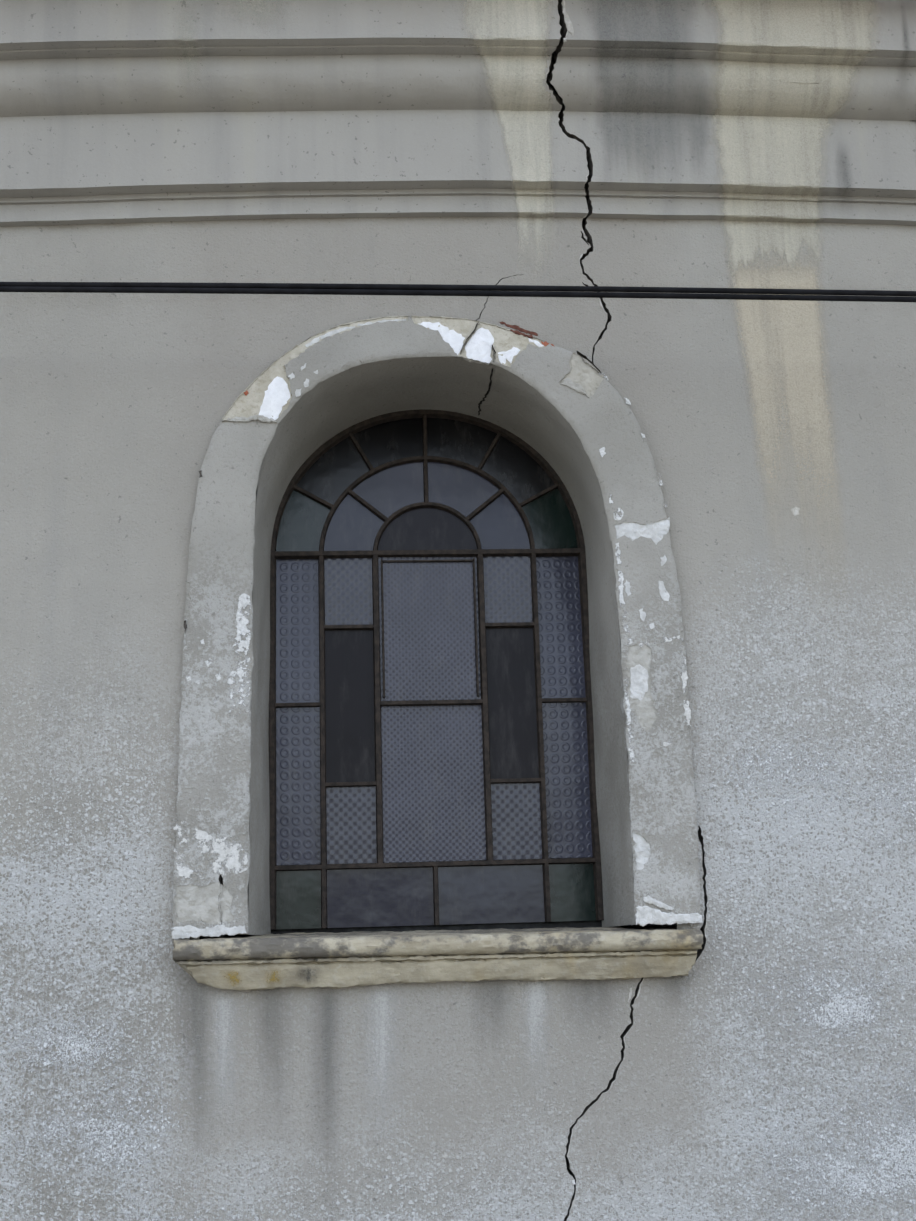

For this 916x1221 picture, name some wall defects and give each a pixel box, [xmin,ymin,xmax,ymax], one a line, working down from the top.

crack [545,0,612,374]
leakage [713,0,873,485]
spalling [221,316,554,423]
crack [460,274,523,415]
peeling [205,593,251,713]
peeling [609,495,692,762]
peeling [172,821,248,939]
peeling [633,831,651,870]
spalling [635,895,703,927]
crack [696,826,708,960]
leakage [528,982,545,1047]
crack [564,978,644,1221]